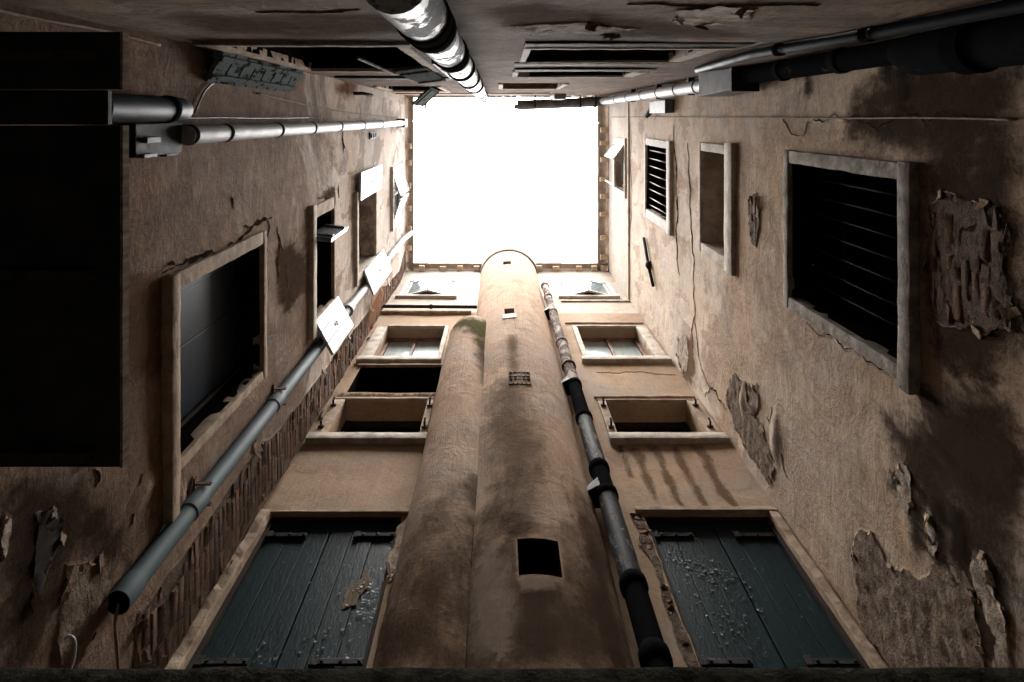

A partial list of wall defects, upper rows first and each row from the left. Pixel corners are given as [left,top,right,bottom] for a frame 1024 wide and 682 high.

crack [163,195,283,276]
crack [673,125,726,410]
spalling [748,192,761,249]
flaking render [923,189,1022,340]
flaking render [132,250,408,669]
damp [619,446,738,506]
spalling [725,372,775,484]
spalling [893,461,915,517]
damp [844,65,1024,667]
damp [373,497,634,669]
spalling [629,512,785,667]
spalling [851,512,1015,668]